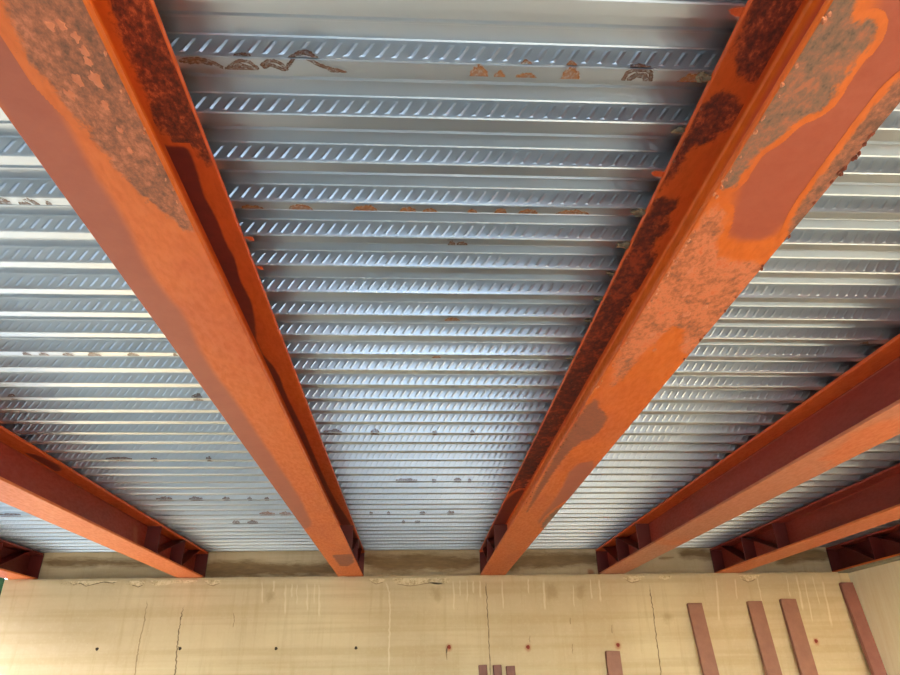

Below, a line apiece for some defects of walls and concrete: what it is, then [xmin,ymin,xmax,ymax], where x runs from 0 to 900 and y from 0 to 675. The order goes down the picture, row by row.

corrosion [98,0,348,171]
corrosion [466,58,539,78]
corrosion [778,71,900,243]
corrosion [509,0,803,493]
corrosion [538,501,567,530]
leakage [41,553,153,573]
crack [134,595,149,675]
crack [174,604,185,675]
crack [484,580,492,675]
crack [648,582,662,675]